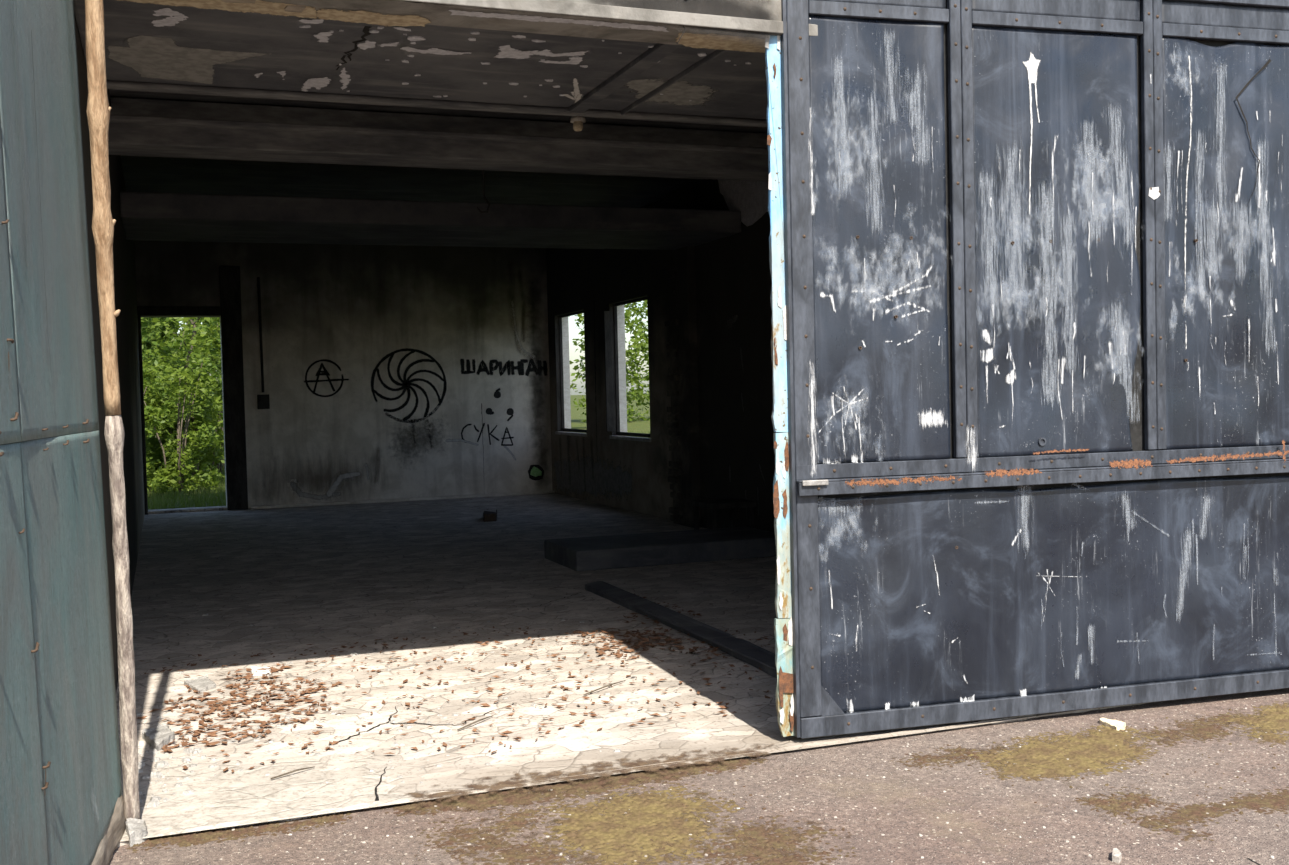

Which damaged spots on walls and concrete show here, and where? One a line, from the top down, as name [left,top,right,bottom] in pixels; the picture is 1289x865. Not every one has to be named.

crack [336,26,371,70]
peeling [108,0,780,96]
peeling [778,287,787,340]
corrosion [773,441,789,518]
corrosion [845,475,962,487]
corrosion [985,449,1089,477]
corrosion [1109,440,1289,469]
peeling [777,555,793,646]
corrosion [779,666,794,732]
peeling [779,694,794,724]